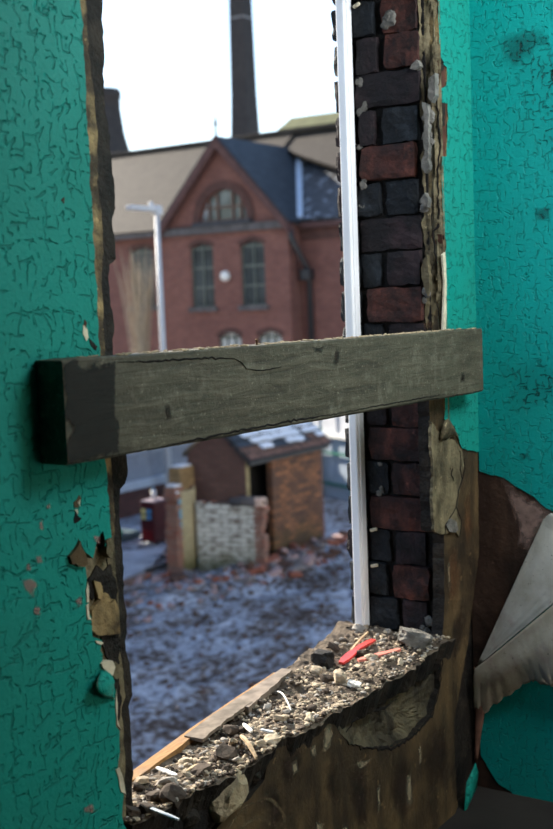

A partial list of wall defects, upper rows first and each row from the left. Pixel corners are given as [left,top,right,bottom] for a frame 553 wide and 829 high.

spalling [410,59,447,174]
spalling [421,193,431,208]
spalling [421,254,432,296]
spalling [74,496,82,523]
spalling [163,494,185,574]
flaking render [209,399,479,829]
spalling [67,534,126,818]